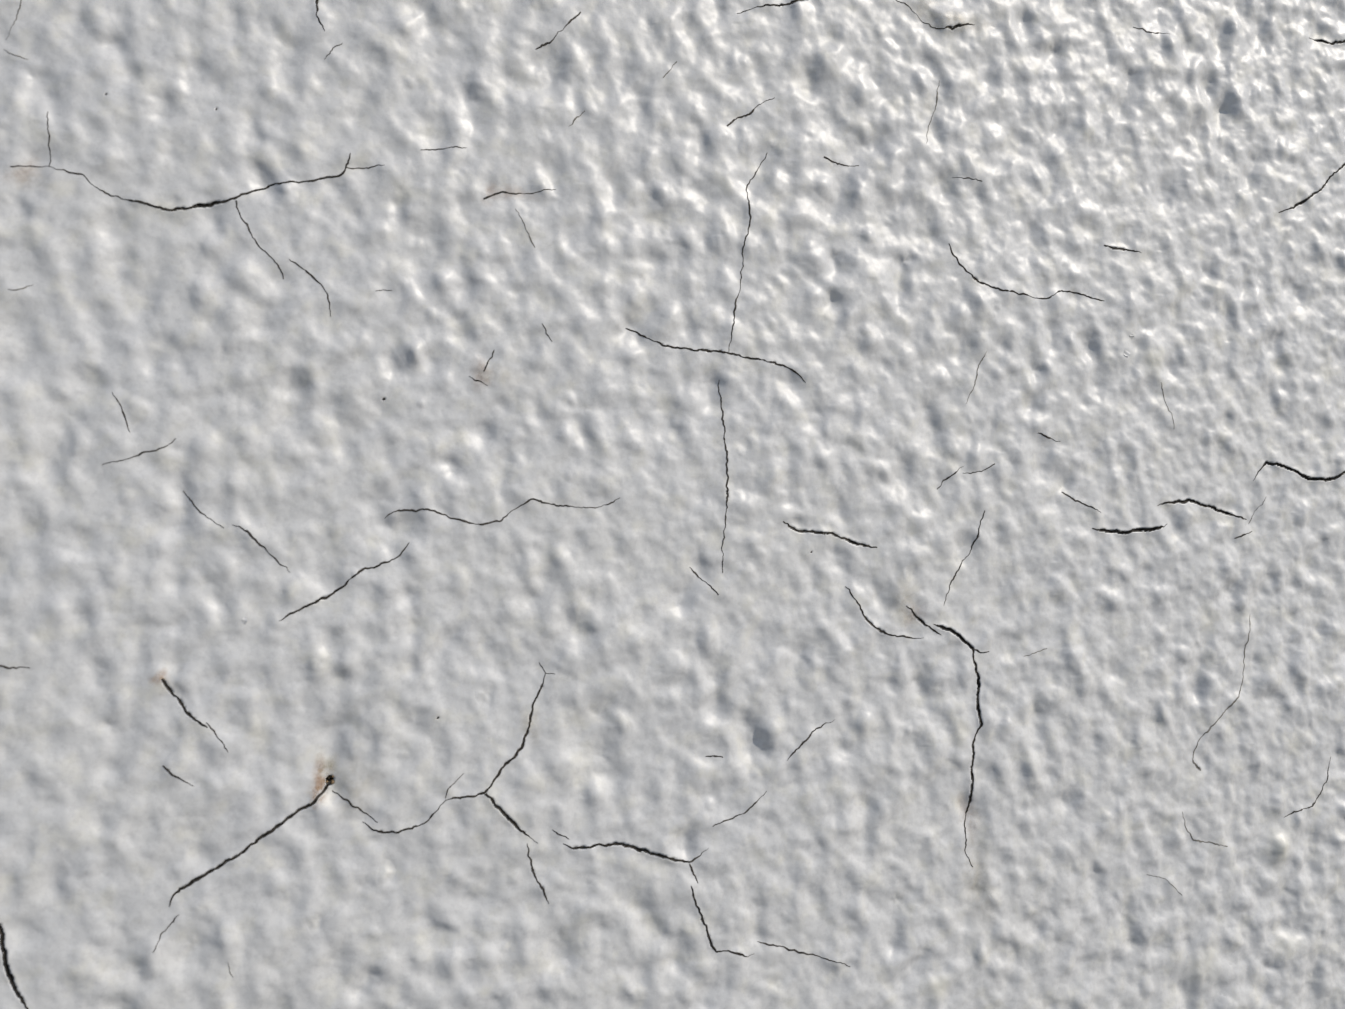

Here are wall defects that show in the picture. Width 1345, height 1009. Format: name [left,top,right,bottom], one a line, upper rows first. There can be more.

crack [737,0,803,14]
crack [10,112,383,316]
crack [1279,163,1345,213]
crack [949,244,1104,301]
crack [626,153,806,595]
crack [280,498,619,621]
crack [783,521,877,548]
crack [1062,461,1345,539]
crack [845,510,989,867]
crack [153,662,850,967]
crack [0,925,29,1009]